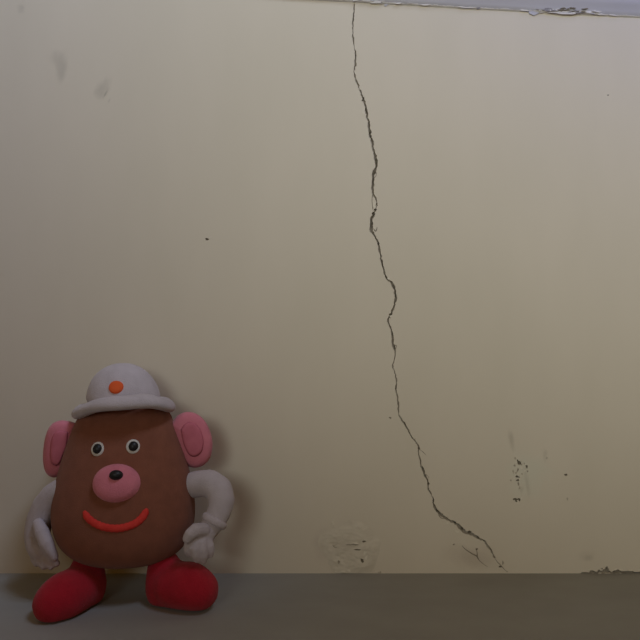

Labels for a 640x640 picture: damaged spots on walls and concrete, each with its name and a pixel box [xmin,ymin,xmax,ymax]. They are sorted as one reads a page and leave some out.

peeling [520,7,617,16]
crack [352,4,507,572]
peeling [318,519,381,573]